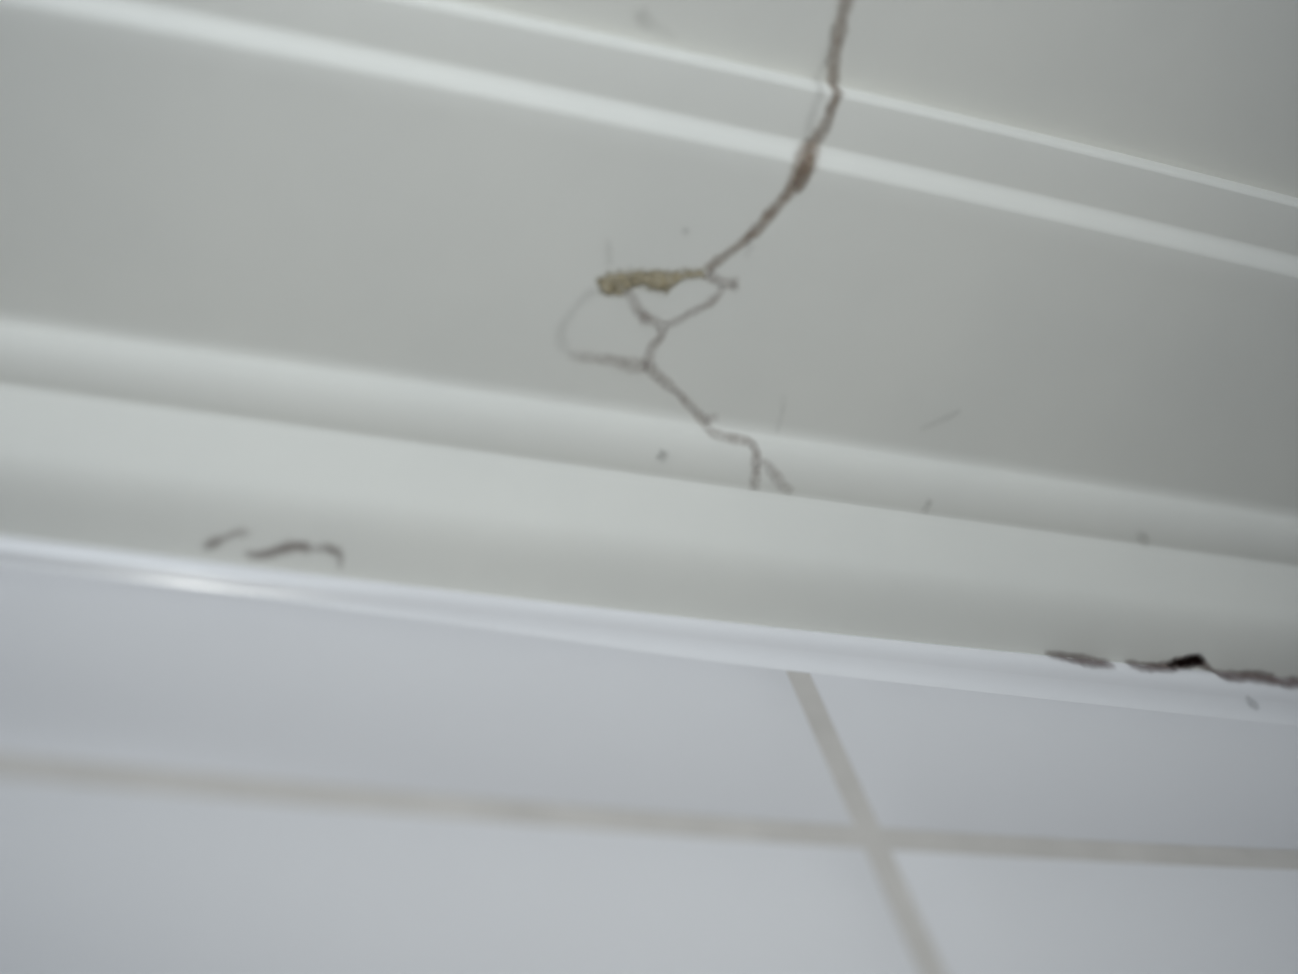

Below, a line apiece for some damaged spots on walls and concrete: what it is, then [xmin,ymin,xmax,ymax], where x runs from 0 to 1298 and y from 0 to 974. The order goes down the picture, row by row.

crack [828,84,838,114]
crack [745,141,815,241]
crack [1062,656,1103,664]
crack [1143,655,1298,686]